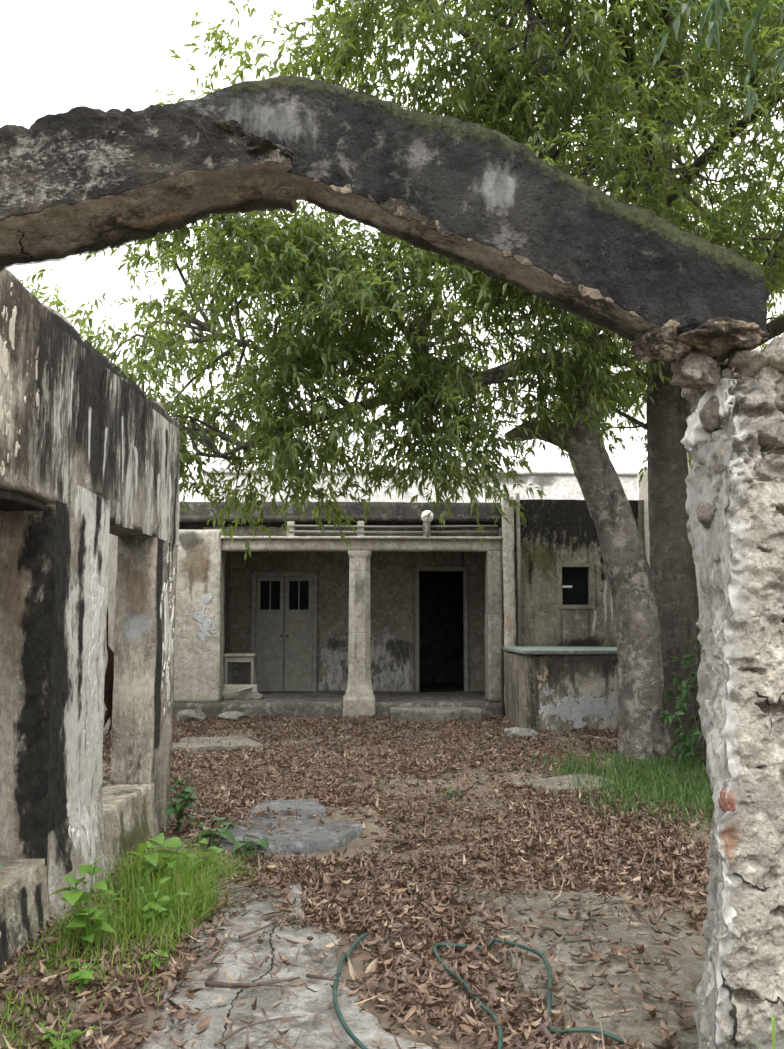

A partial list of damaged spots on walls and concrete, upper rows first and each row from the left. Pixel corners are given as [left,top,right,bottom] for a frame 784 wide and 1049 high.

damp [307,199,636,341]
spalling [552,274,614,304]
peeling [0,282,49,476]
peeling [680,378,784,539]
damp [0,199,293,884]
damp [464,475,613,631]
peeling [537,666,619,728]
damp [540,654,619,731]
crack [750,690,784,735]
rust [721,827,739,859]
crack [196,912,334,1049]
crack [721,970,784,1048]